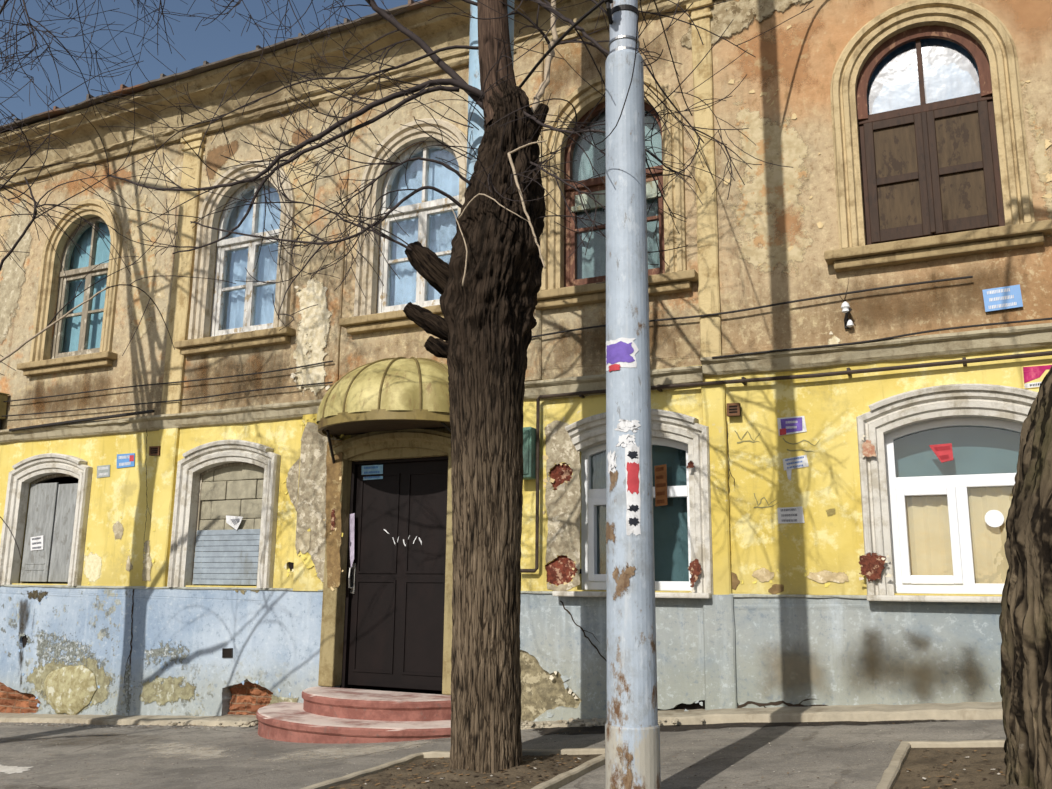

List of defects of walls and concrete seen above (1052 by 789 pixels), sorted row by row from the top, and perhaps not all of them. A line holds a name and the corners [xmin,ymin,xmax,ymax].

peeling [710,0,823,275]
peeling [1020,80,1052,220]
peeling [283,417,344,591]
peeling [542,420,581,591]
crack [123,430,151,716]
peeling [0,625,199,714]
spalling [227,680,299,715]
spalling [520,650,582,722]
crack [560,600,607,662]
water stain [773,655,819,686]
water stain [859,634,978,694]